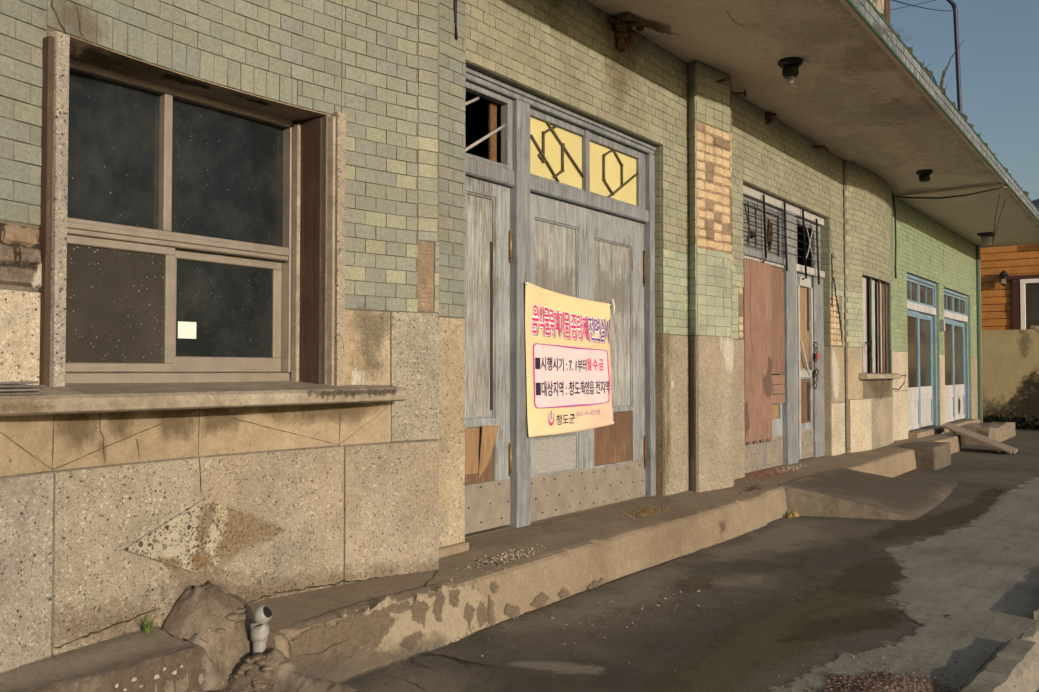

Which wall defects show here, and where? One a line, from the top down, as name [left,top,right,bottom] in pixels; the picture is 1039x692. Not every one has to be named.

crack [51,0,91,45]